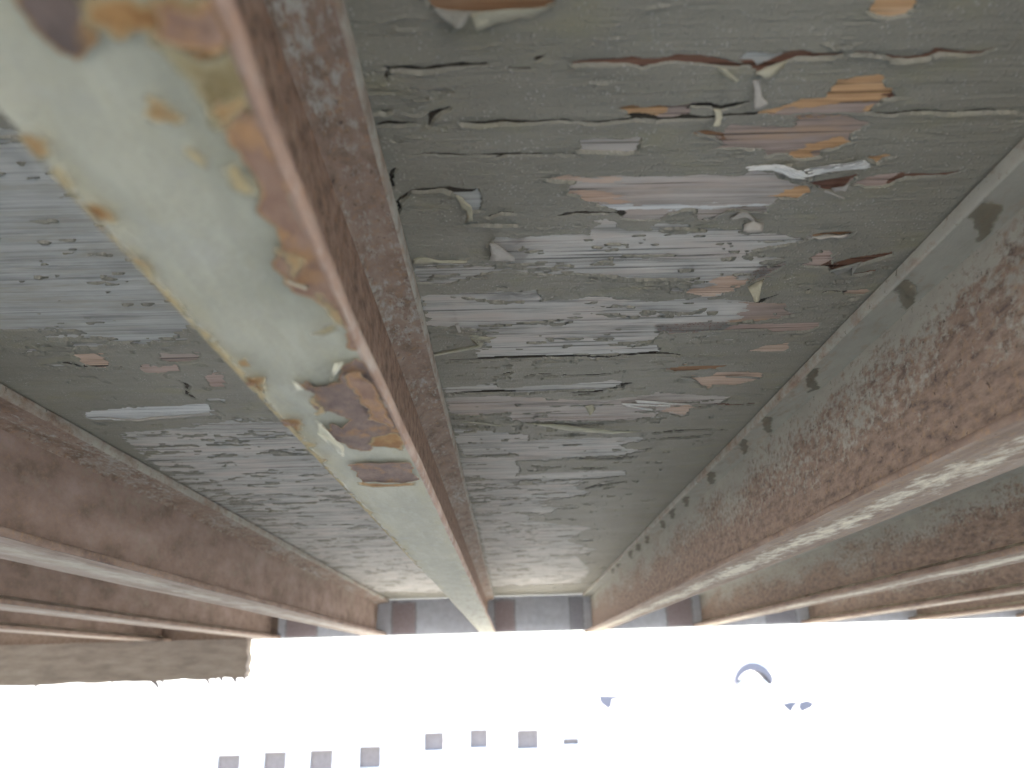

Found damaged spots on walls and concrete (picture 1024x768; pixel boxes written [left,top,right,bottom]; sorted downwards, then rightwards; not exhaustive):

crack [384,55,544,78]
crack [377,101,758,125]
peeling [693,52,894,158]
crack [389,168,477,210]
crack [558,208,627,216]
peeling [0,128,198,342]
peeling [413,154,898,359]
rust [14,0,421,568]
peeling [442,364,763,586]
rust [271,617,318,637]
rust [391,601,416,634]
rust [665,597,694,626]